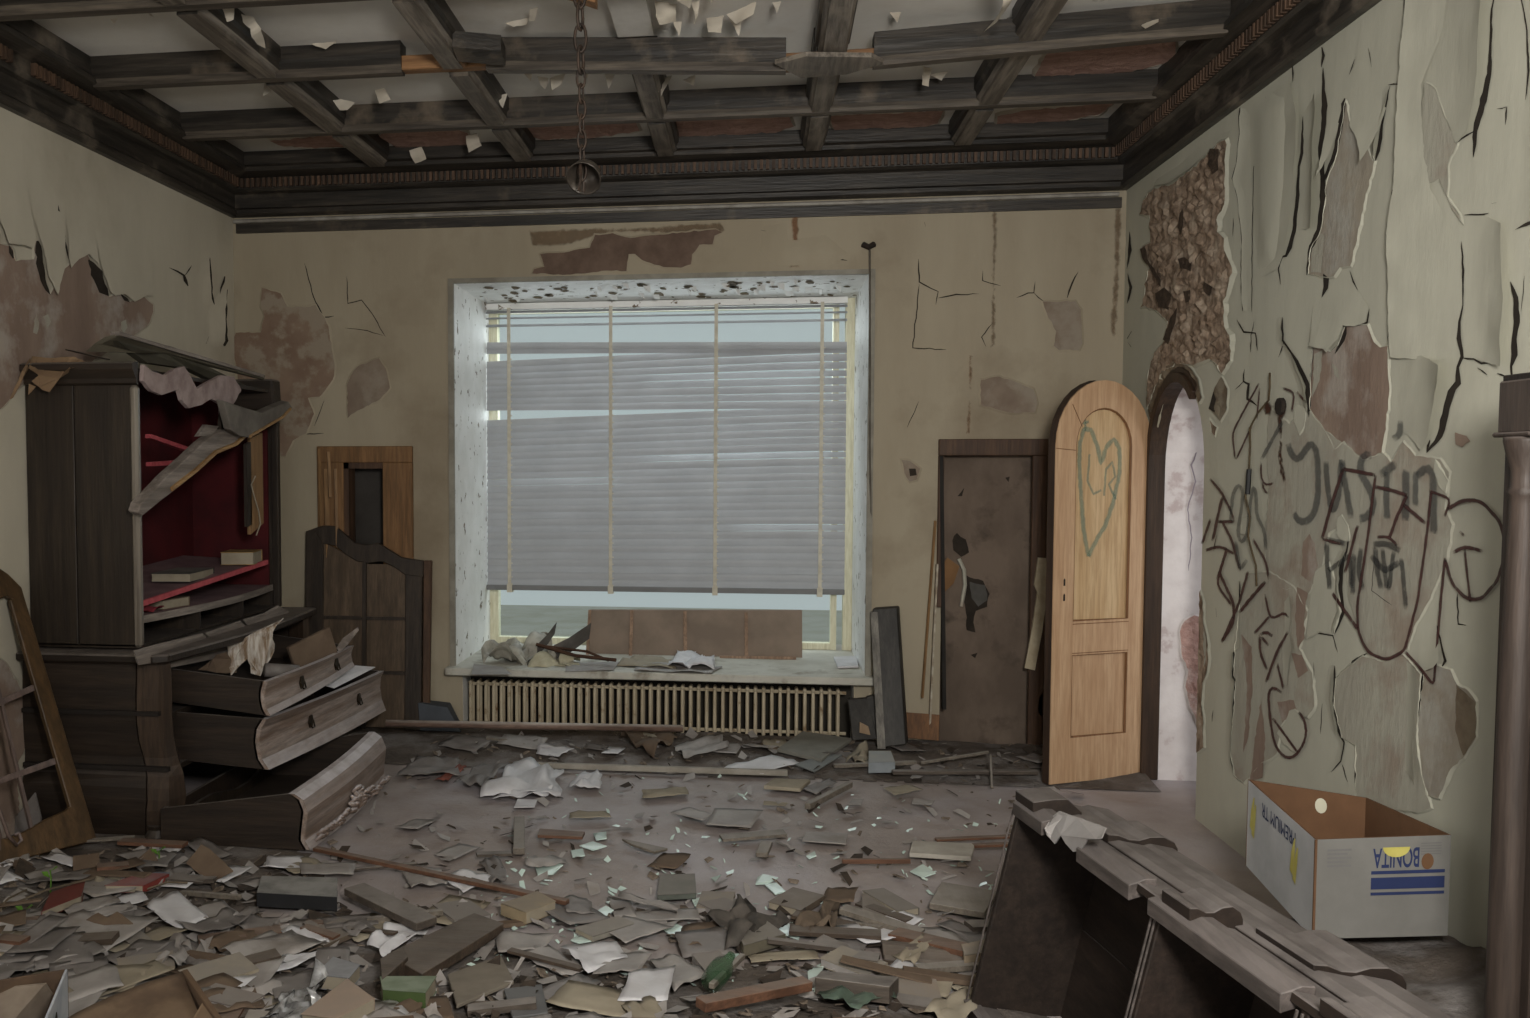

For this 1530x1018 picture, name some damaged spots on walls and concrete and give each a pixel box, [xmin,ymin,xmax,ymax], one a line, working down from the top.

flaking render [0,127,155,410]
flaking render [234,287,391,458]
crack [304,263,386,337]
flaking render [484,228,850,303]
crack [912,222,1078,350]
flaking render [1041,299,1084,353]
flaking render [1139,130,1237,438]
flaking render [1230,57,1480,814]
crack [1232,0,1530,453]
flaking render [1178,589,1212,754]
crack [1313,533,1390,782]
crack [1416,593,1499,720]